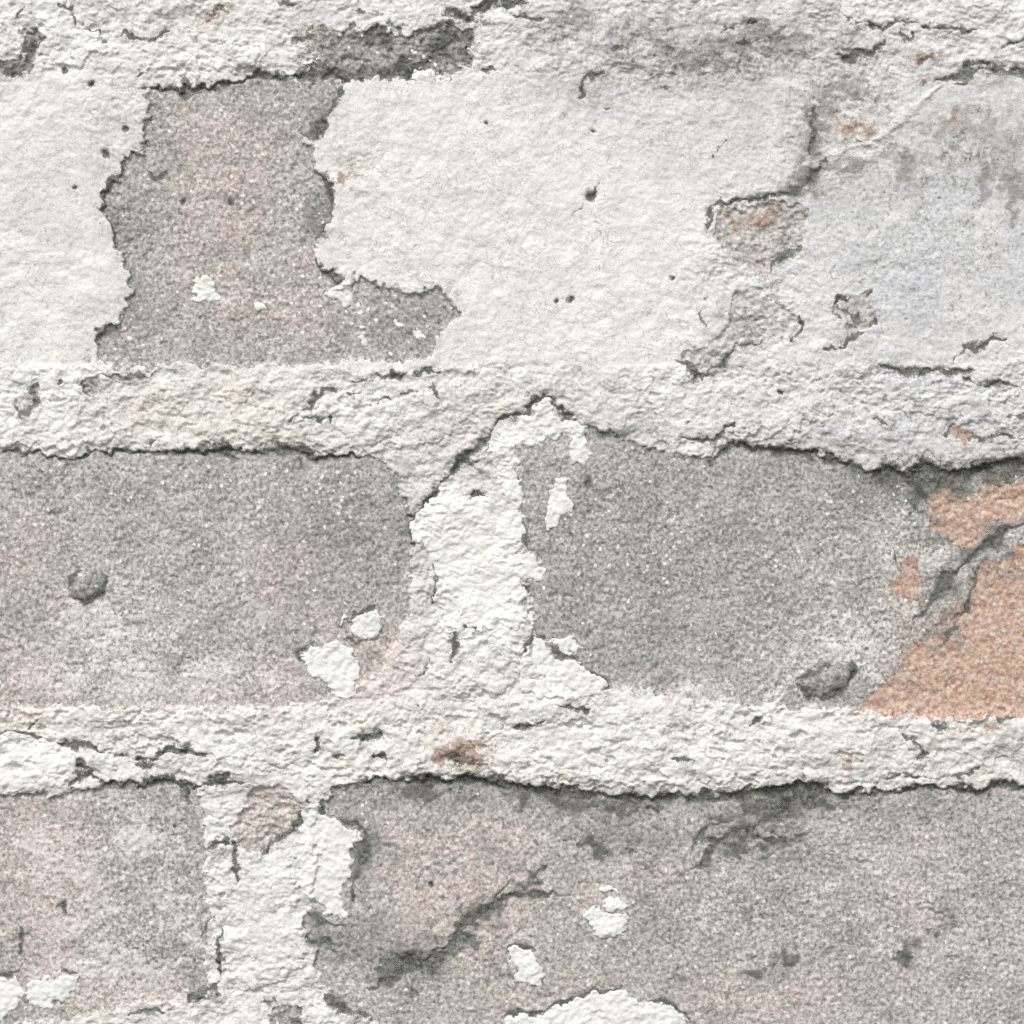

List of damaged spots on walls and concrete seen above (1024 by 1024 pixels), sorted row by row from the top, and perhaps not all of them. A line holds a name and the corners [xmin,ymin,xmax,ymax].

peeling [78,19,489,397]
peeling [674,199,809,381]
crack [406,391,577,547]
crack [680,412,1024,640]
spalling [919,471,1024,550]
peeling [291,604,383,698]
spalling [859,543,1024,721]
peeling [0,974,79,1022]
peeling [229,784,379,955]
peeling [506,942,546,987]
peeling [503,984,691,1024]
peeling [582,885,632,939]